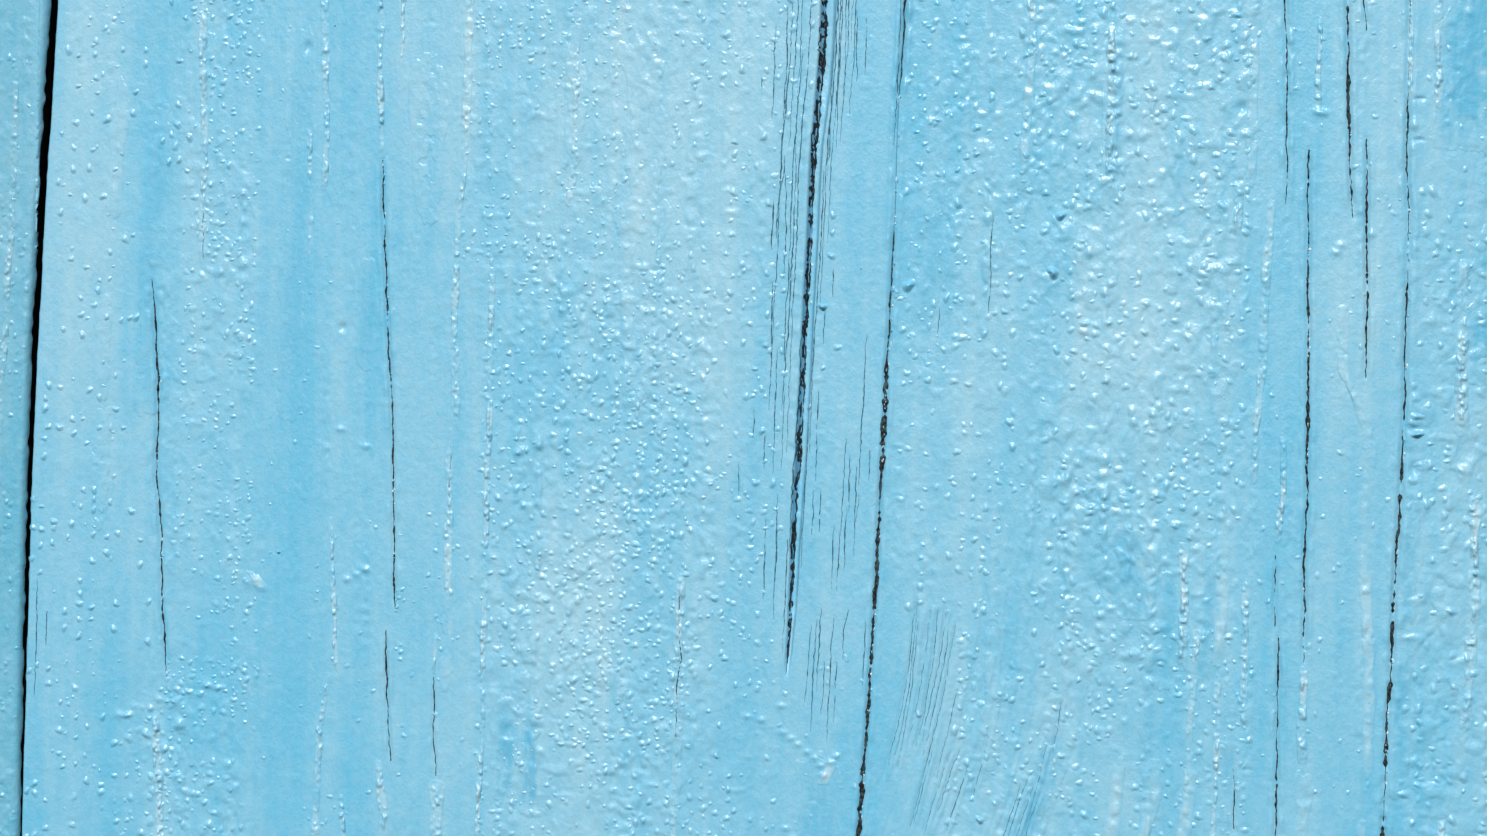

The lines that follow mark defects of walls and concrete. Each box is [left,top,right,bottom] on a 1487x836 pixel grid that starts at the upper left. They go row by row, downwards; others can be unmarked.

crack [152,281,168,677]
crack [382,160,397,761]
crack [738,0,907,836]
crack [1274,0,1311,836]
crack [1346,0,1369,377]
crack [1380,67,1411,836]